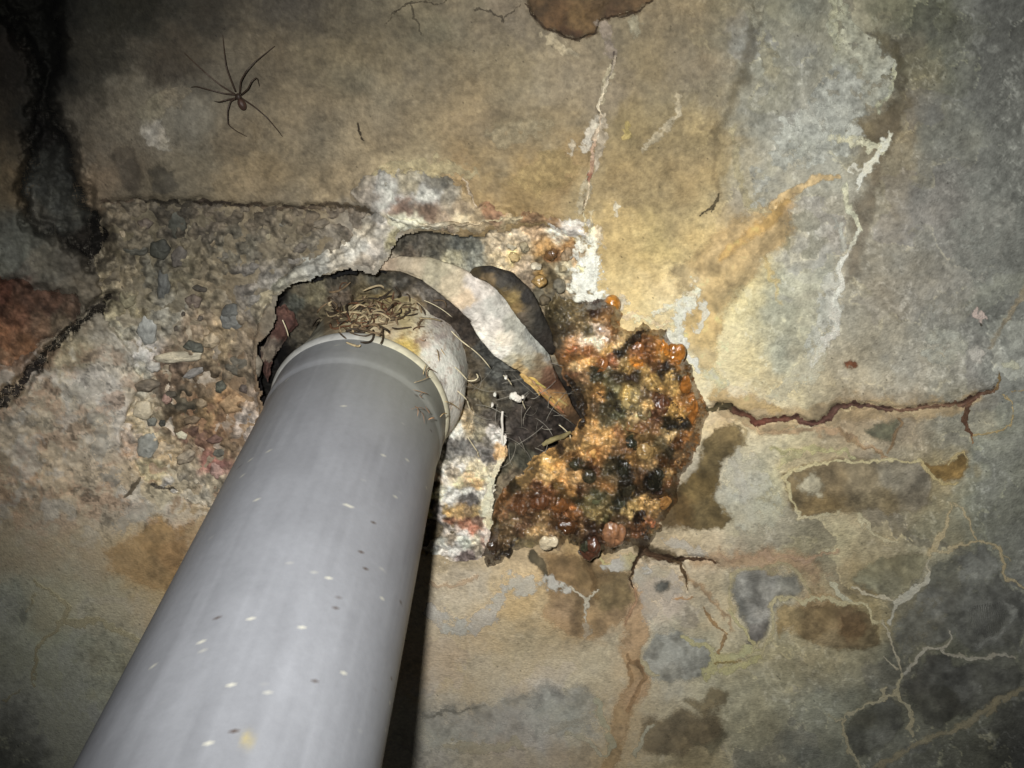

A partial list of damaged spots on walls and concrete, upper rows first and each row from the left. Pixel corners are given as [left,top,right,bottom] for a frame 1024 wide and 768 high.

water stain [106,516,187,589]
spalling [94,198,523,508]
spalling [421,395,508,567]
crack [629,545,740,665]
water stain [423,210,968,639]
corrosion [671,173,841,371]
water stain [769,0,912,400]
crack [705,373,1024,444]